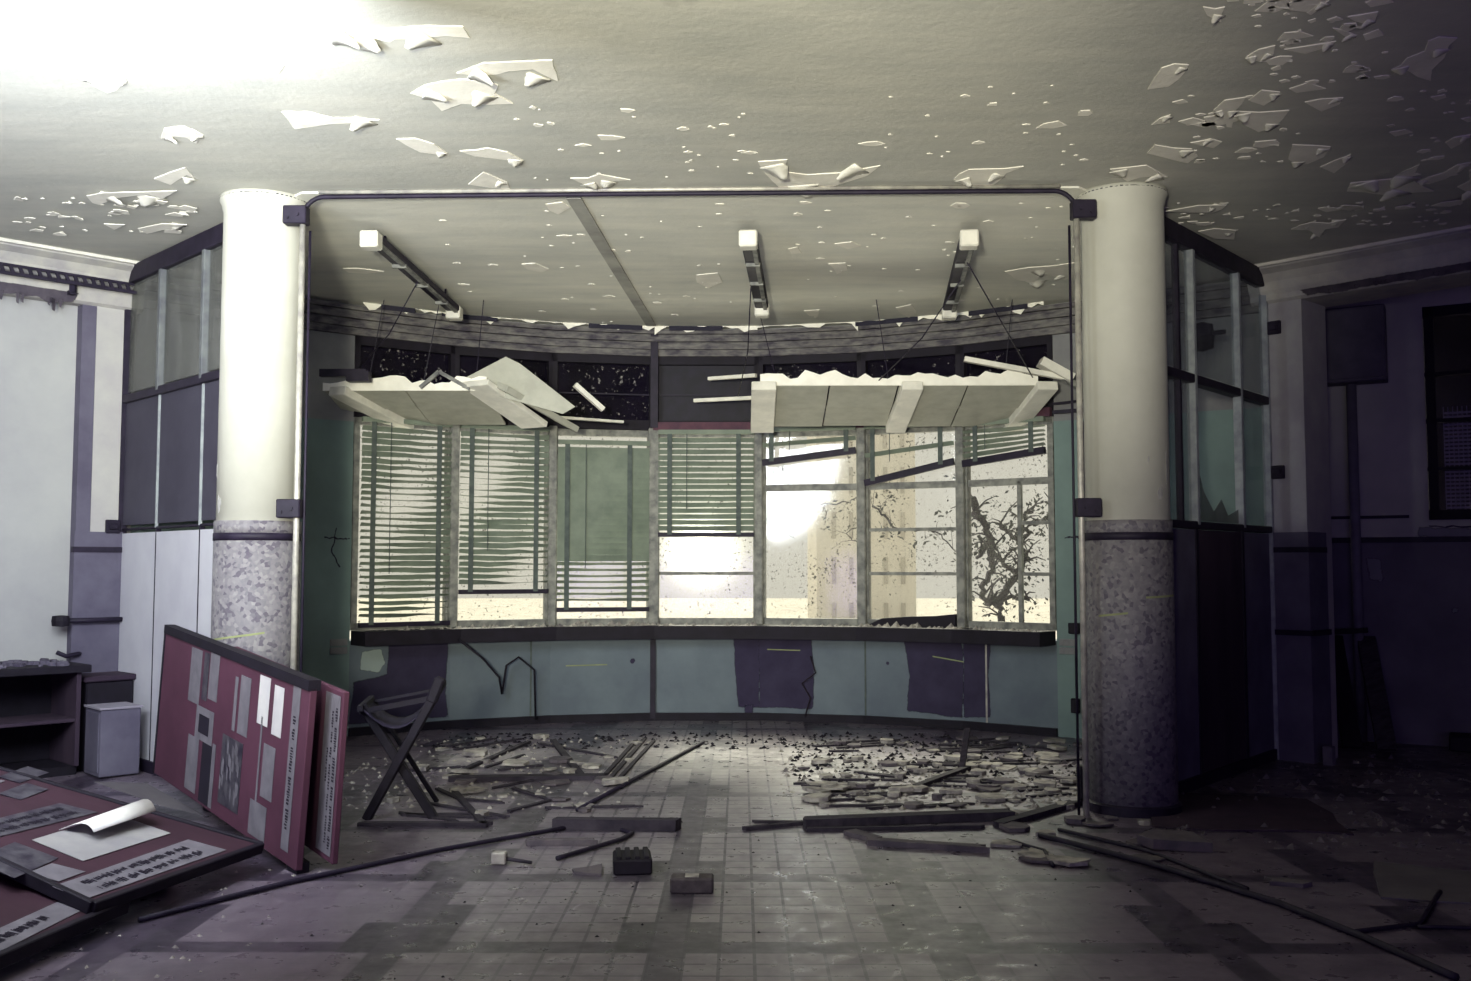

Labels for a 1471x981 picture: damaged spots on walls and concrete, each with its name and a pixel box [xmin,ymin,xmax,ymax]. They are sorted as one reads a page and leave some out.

peeling [286,25,470,54]
peeling [411,59,558,127]
peeling [12,167,197,236]
peeling [161,126,204,144]
peeling [282,111,379,132]
peeling [397,138,524,189]
peeling [558,135,625,154]
peeling [571,173,630,190]
peeling [707,113,892,274]
peeling [1022,110,1093,166]
peeling [1109,0,1471,240]